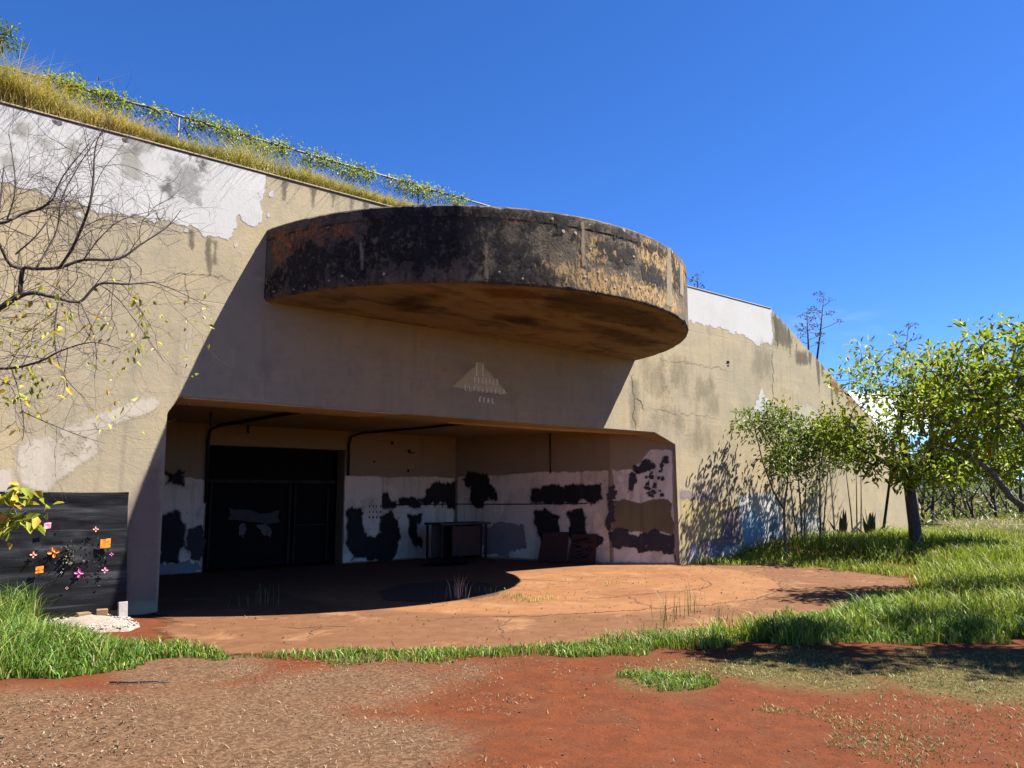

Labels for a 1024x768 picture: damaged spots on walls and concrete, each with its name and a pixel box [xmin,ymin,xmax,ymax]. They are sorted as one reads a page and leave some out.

peeling [0,104,274,247]
peeling [535,224,773,346]
leakage [667,248,683,307]
leakage [772,313,843,397]
crack [631,376,710,423]